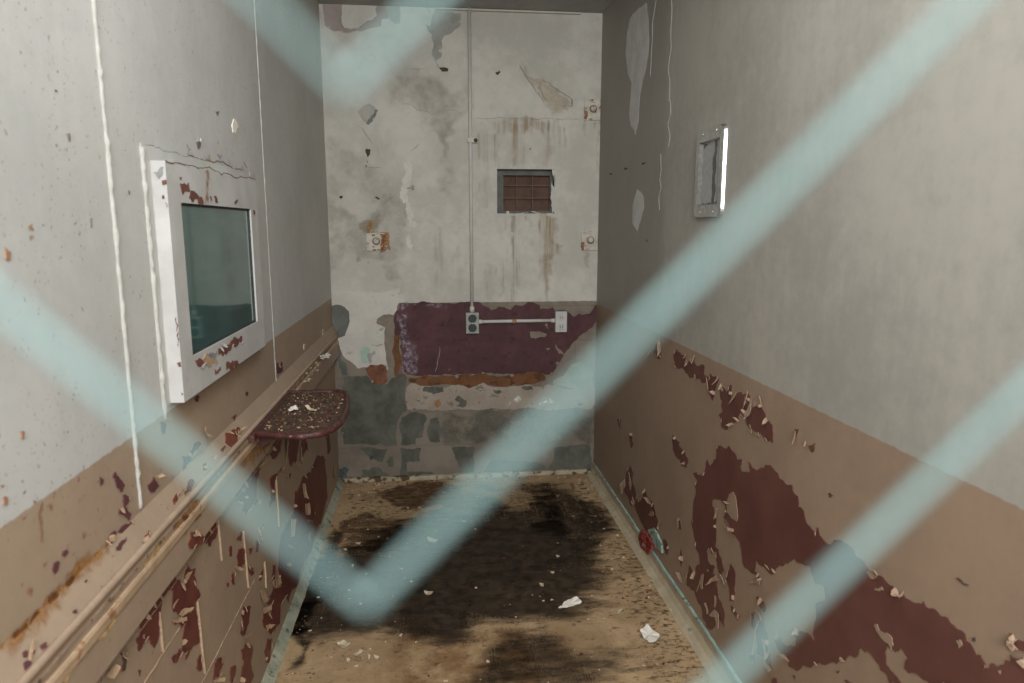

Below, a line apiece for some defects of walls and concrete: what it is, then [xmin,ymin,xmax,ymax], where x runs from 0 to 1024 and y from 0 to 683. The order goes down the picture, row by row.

peeling [625,3,649,135]
crack [147,145,253,179]
corrosion [360,220,390,252]
peeling [195,336,244,374]
peeling [365,301,597,408]
peeling [646,340,773,443]
corrosion [0,544,109,648]
peeling [99,472,135,557]
peeling [106,434,336,683]
water stain [291,481,695,683]
peeling [619,436,849,637]
peeling [753,559,1024,683]